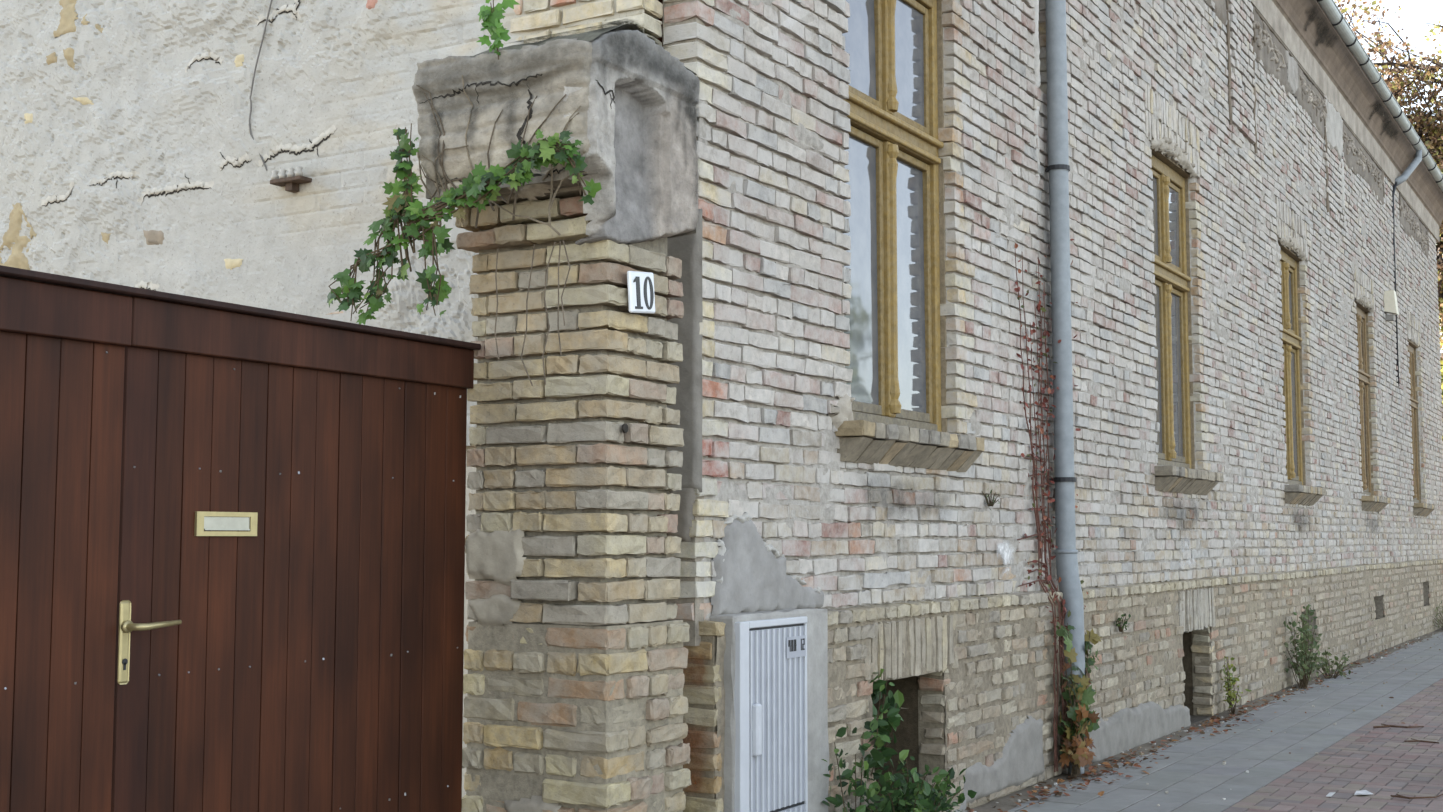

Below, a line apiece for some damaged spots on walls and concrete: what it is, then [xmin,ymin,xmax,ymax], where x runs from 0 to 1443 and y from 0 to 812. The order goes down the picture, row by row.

peeling [46,0,104,70]
crack [38,125,337,207]
crack [420,74,565,191]
peeling [0,203,37,270]